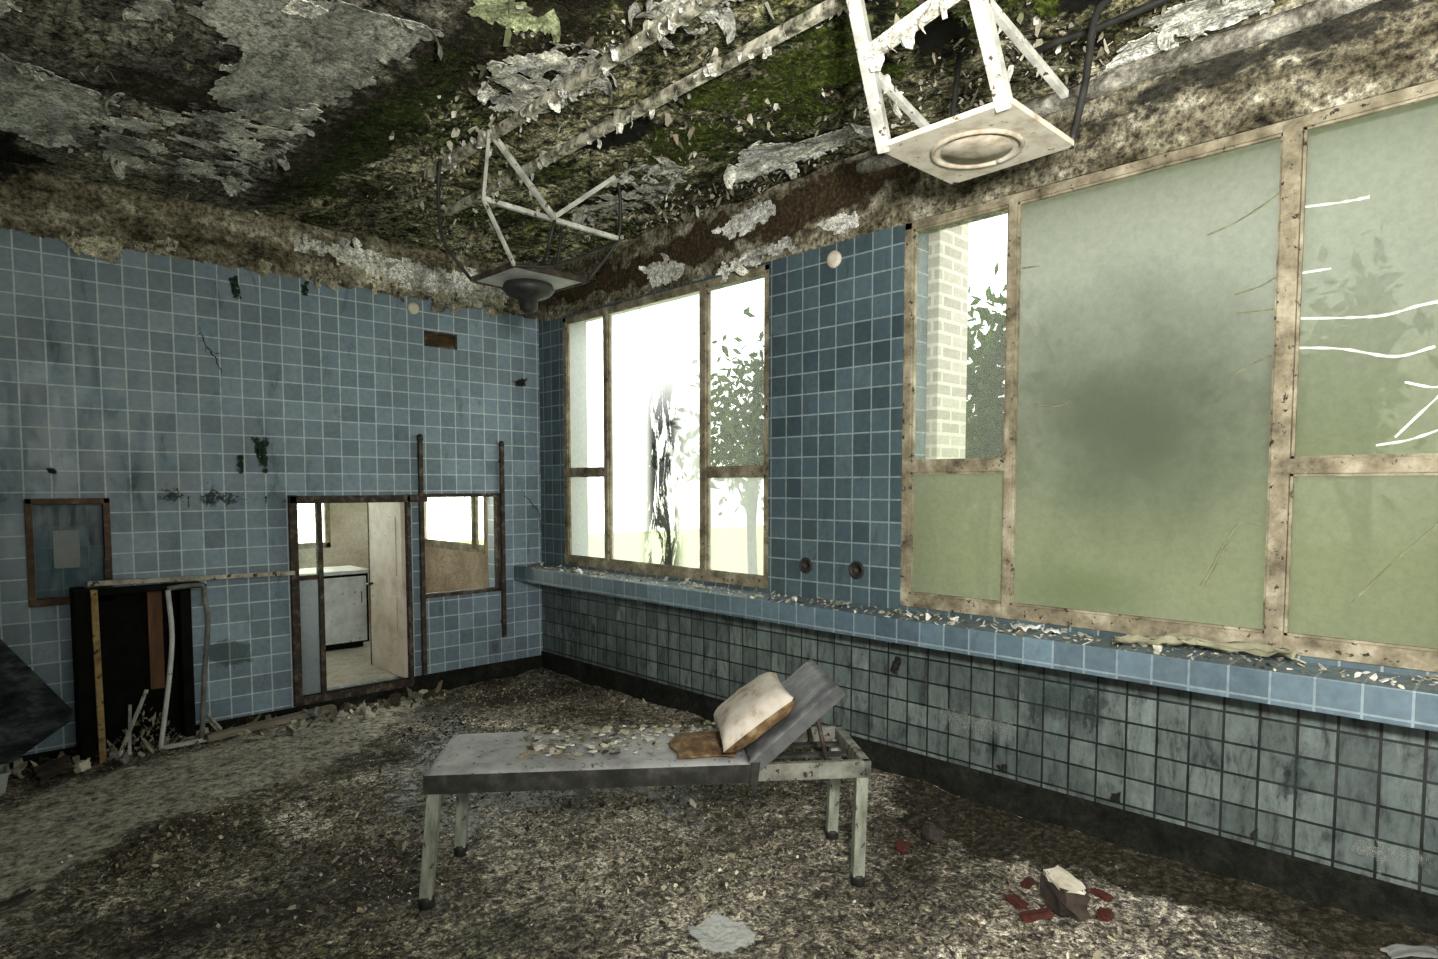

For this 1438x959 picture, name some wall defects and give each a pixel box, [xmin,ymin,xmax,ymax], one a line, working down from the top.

water stain [0,133,56,187]
water stain [258,0,647,189]
spalling [254,0,918,317]
spalling [868,0,990,133]
flaking render [59,231,178,265]